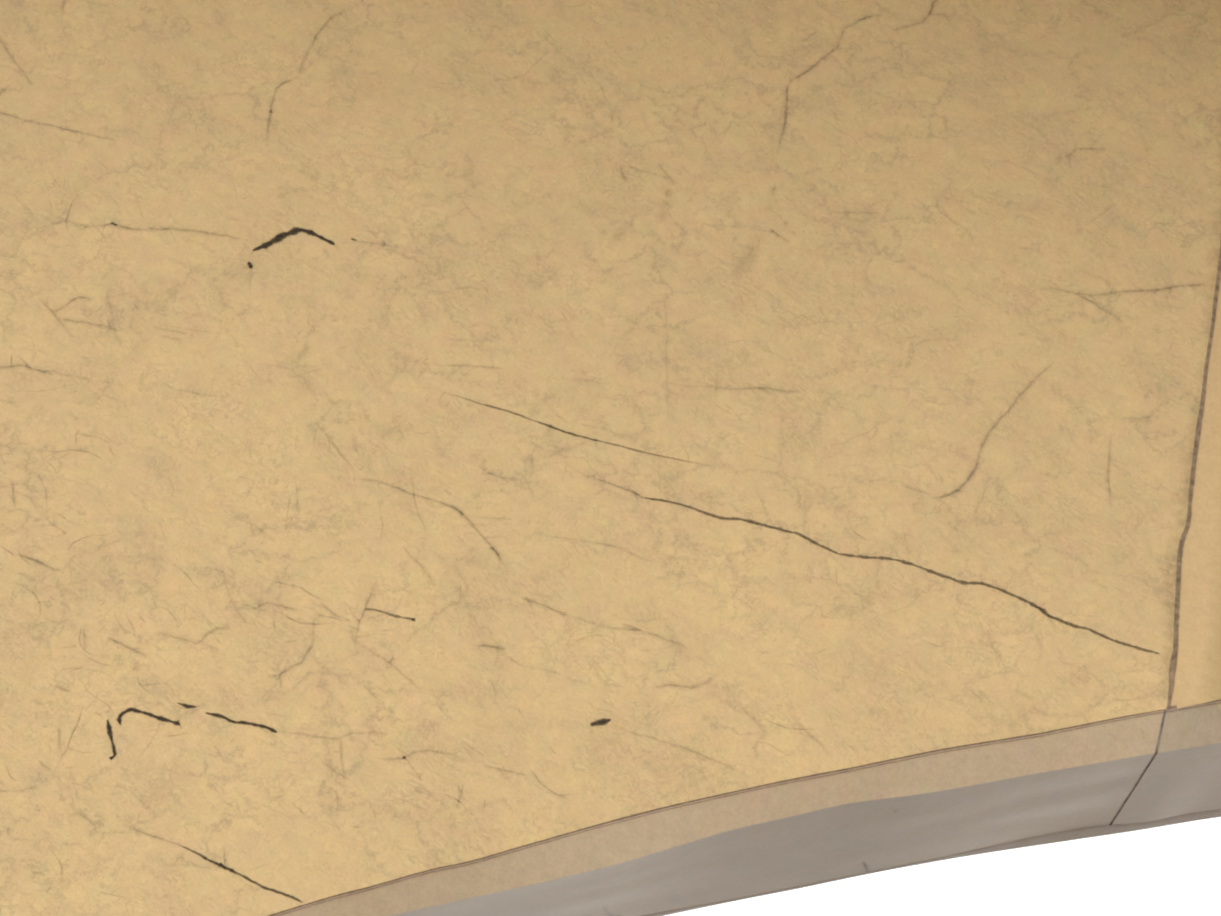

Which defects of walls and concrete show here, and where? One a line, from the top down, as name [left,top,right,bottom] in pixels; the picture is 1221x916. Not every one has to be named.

crack [247,227,356,269]
crack [509,411,611,444]
crack [645,497,1159,654]
crack [107,703,277,760]
crack [184,699,1221,916]